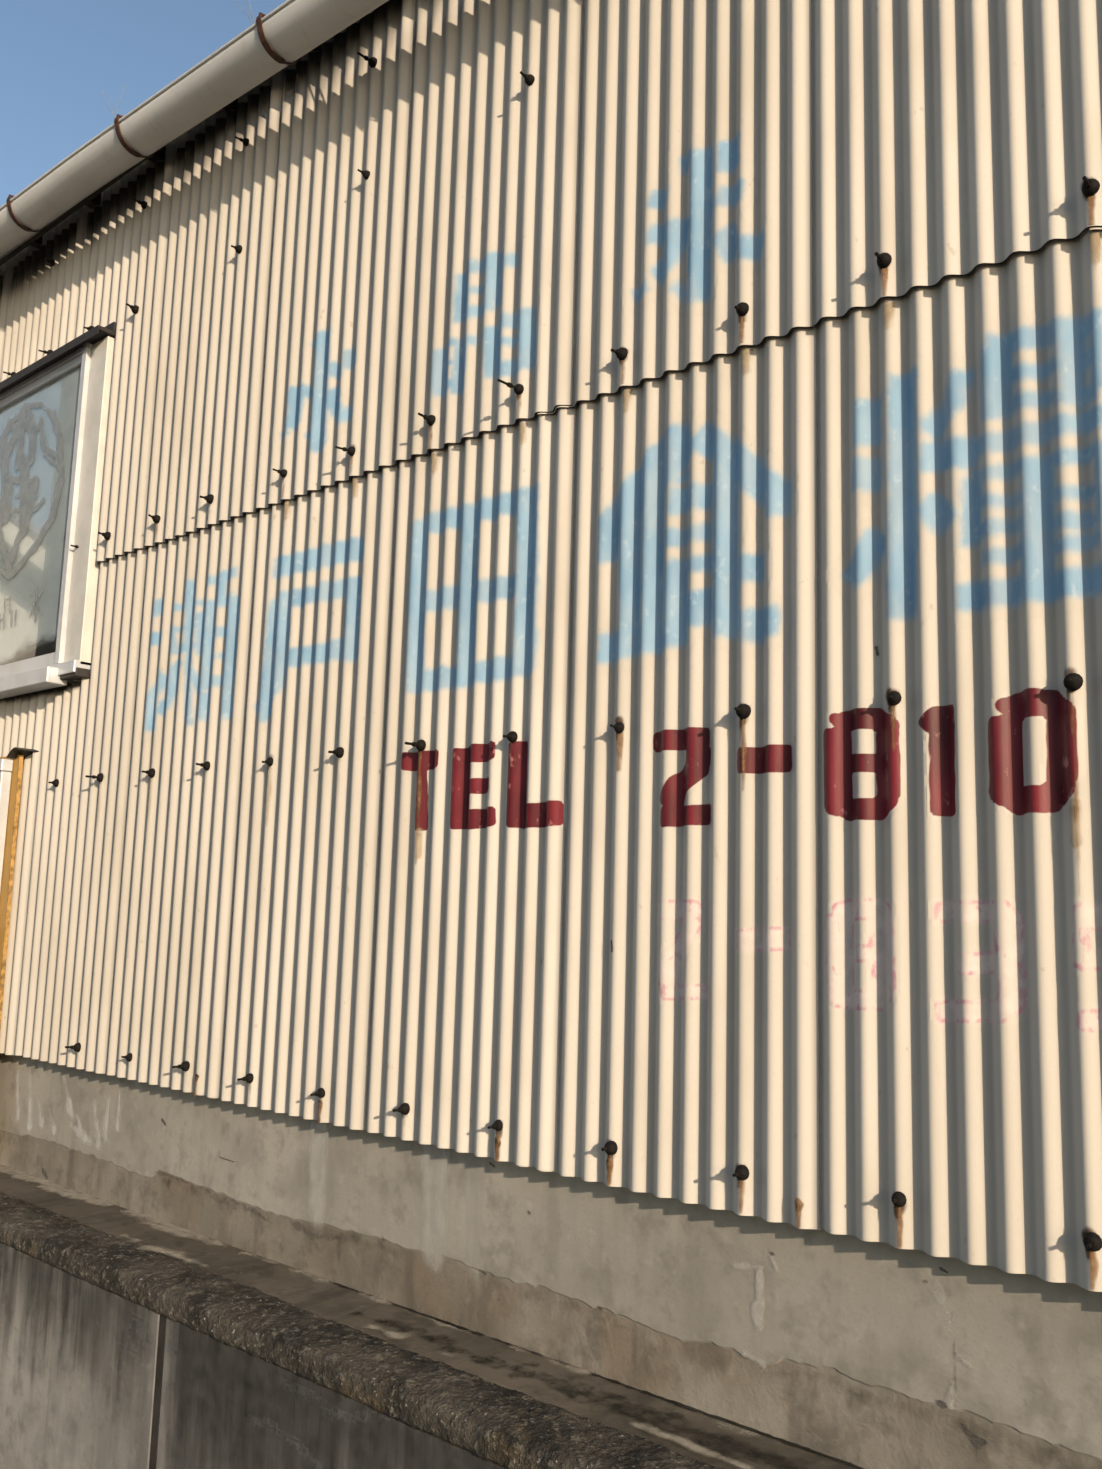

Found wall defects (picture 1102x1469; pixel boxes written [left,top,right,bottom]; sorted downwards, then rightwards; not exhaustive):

corrosion [1082,178,1095,228]
corrosion [880,267,888,296]
damp [0,1164,223,1245]
corrosion [894,1205,905,1248]
corrosion [1082,1228,1098,1289]
damp [0,1243,137,1362]